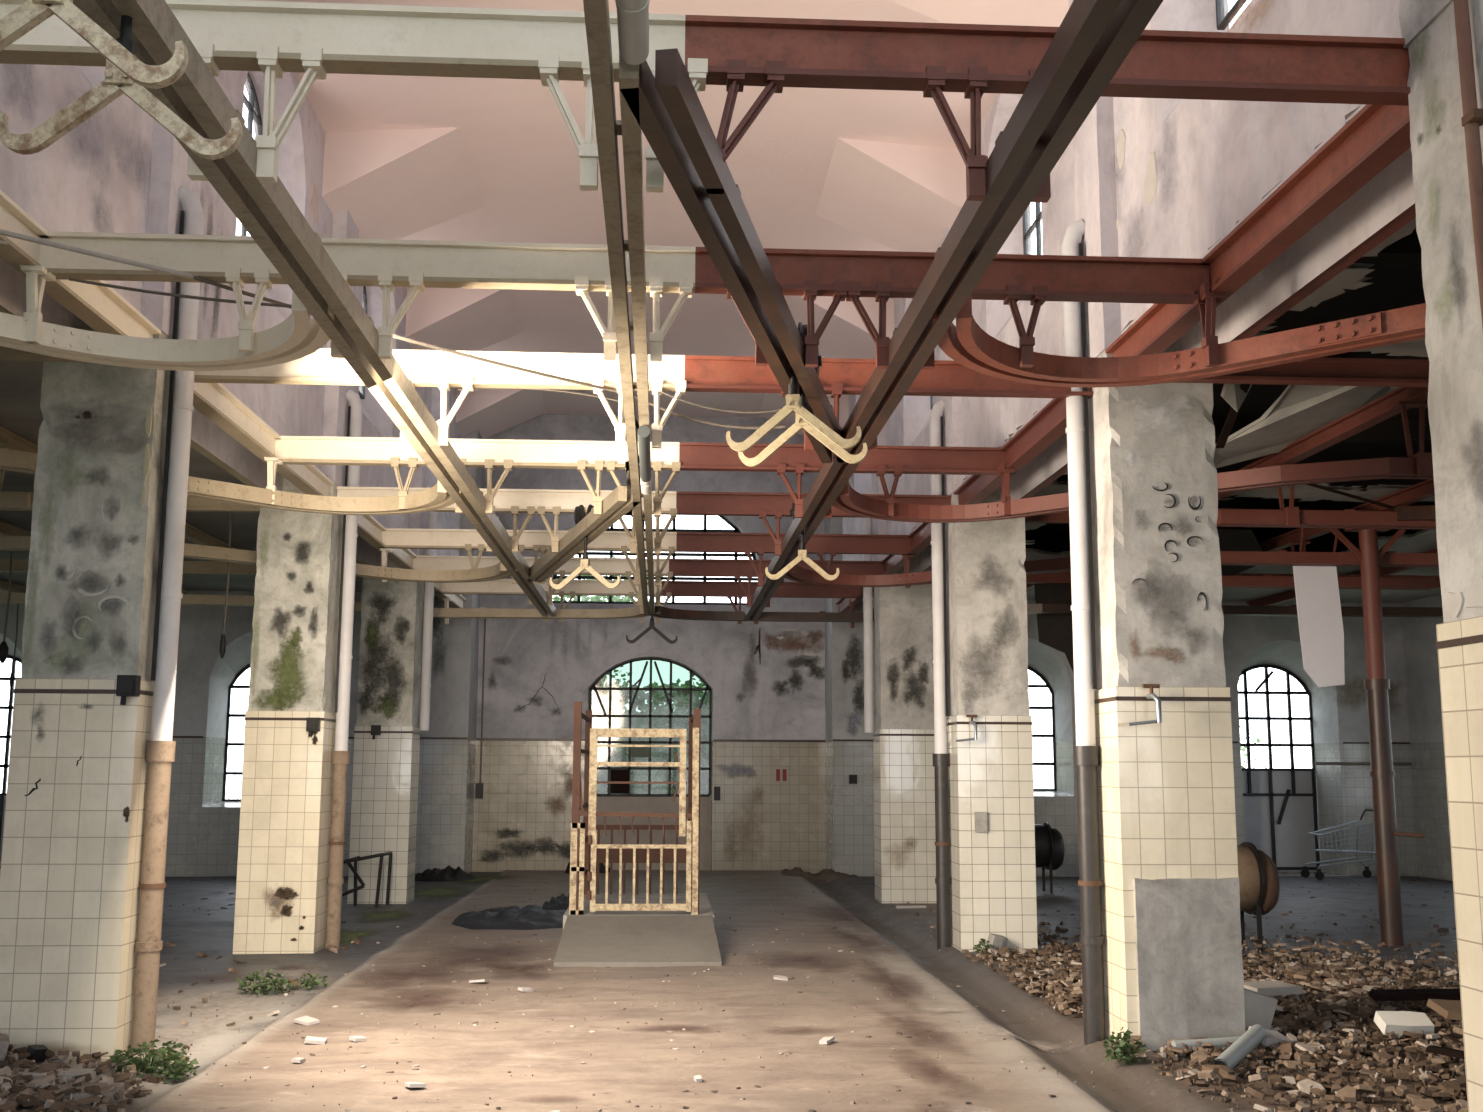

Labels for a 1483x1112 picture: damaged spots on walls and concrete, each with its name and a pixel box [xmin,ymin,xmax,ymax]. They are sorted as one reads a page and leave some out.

damp [79,576,123,612]
damp [272,533,317,635]
damp [359,594,409,710]
damp [774,657,824,694]
damp [843,639,864,734]
damp [887,648,928,707]
damp [965,614,1014,703]
corrosion [1131,640,1181,662]
damp [1137,579,1200,653]
spalling [266,888,306,941]